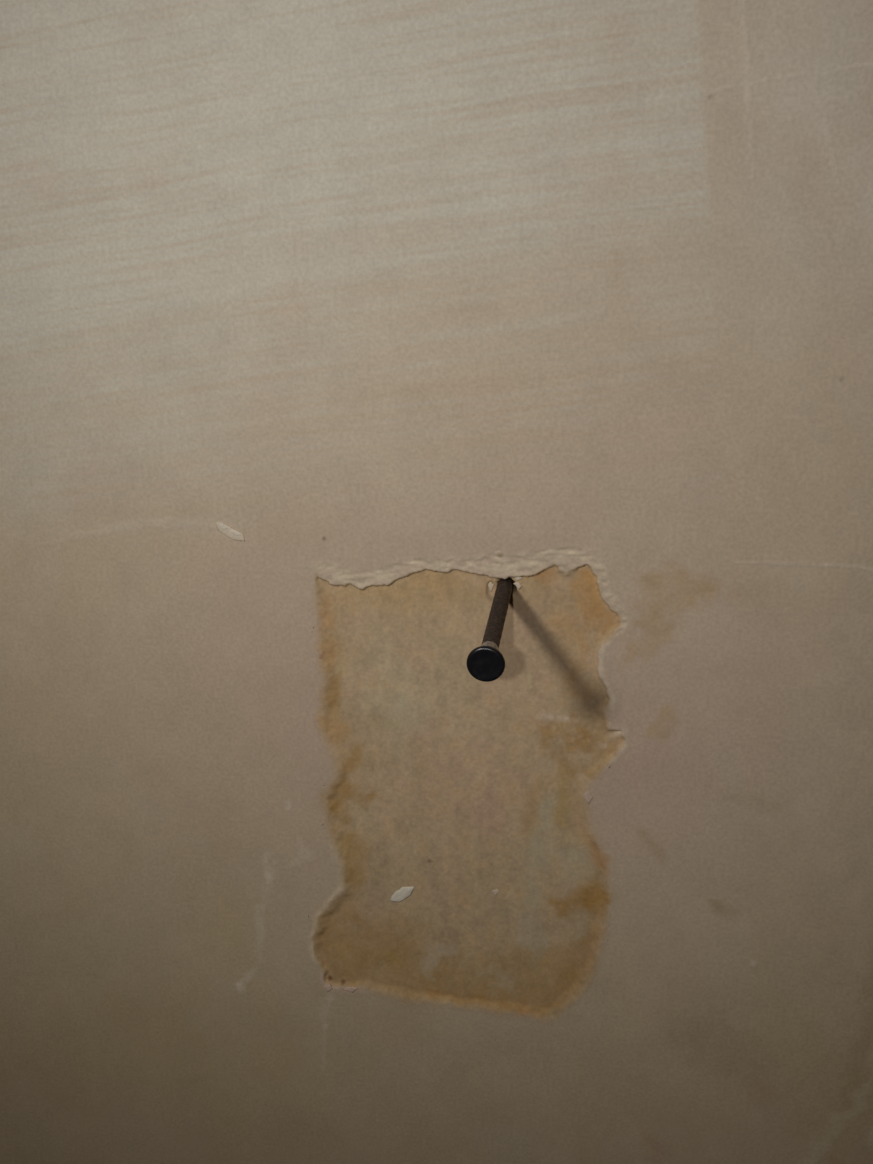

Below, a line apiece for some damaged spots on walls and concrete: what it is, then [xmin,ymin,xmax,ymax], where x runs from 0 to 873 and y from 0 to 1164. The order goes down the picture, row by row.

peeling [304,535,632,1027]